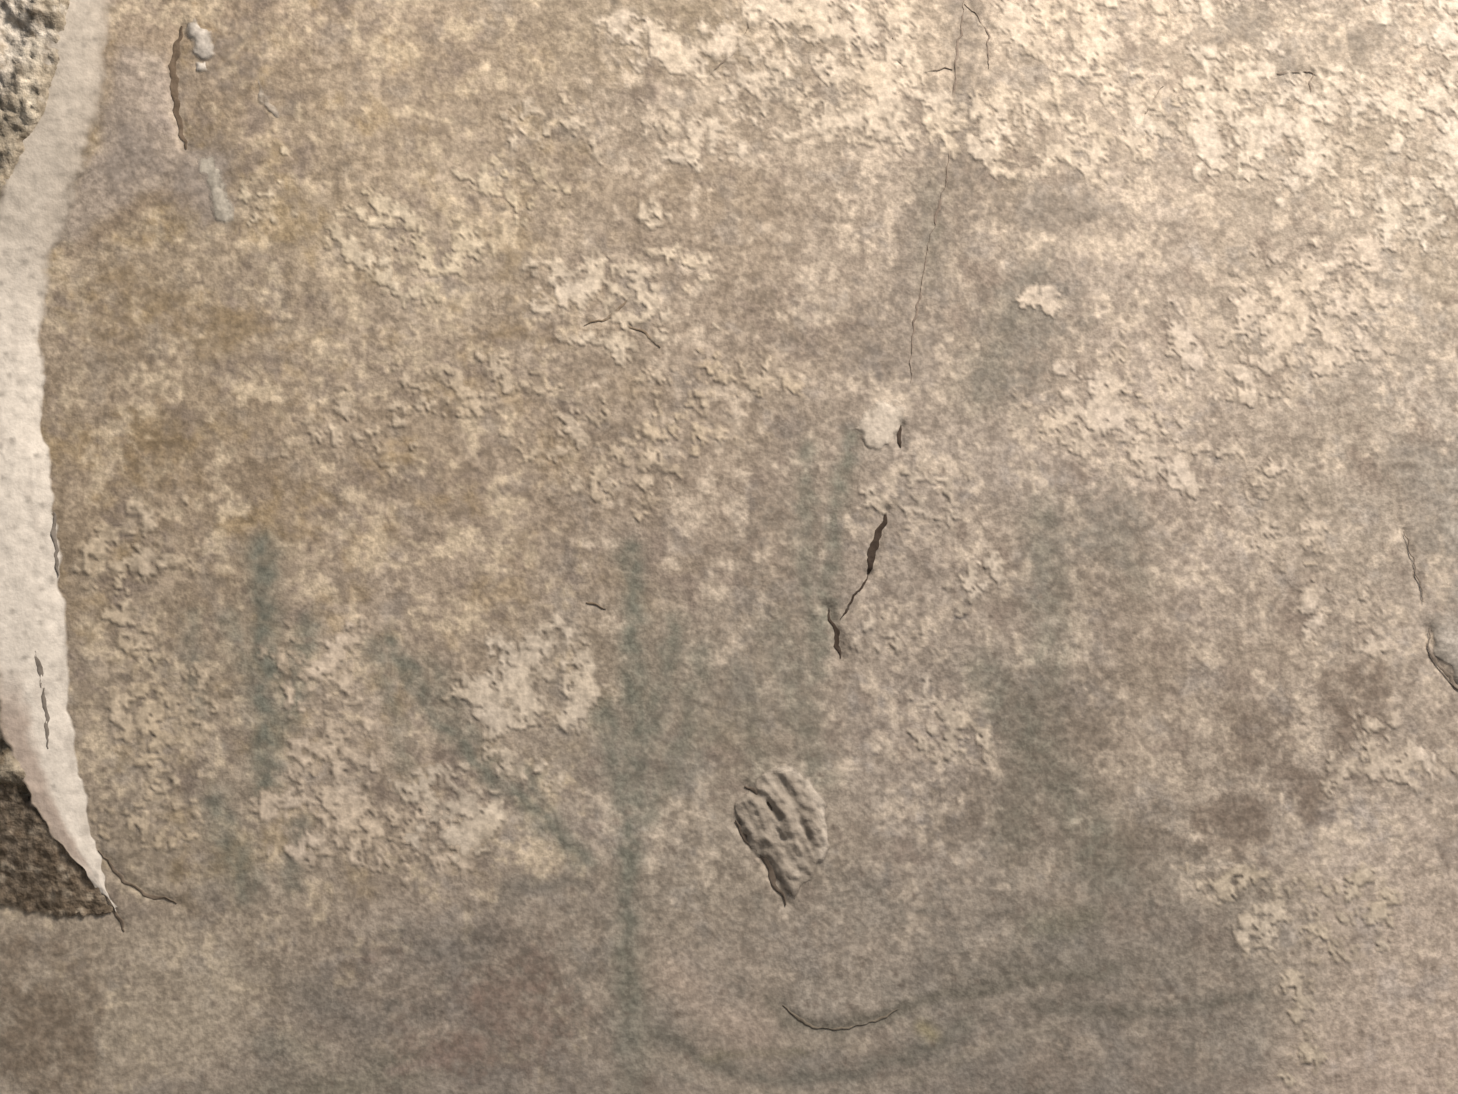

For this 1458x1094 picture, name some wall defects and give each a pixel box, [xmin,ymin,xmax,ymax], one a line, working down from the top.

spalling [0,0,70,199]
crack [895,425,903,447]
crack [828,513,887,659]
crack [1403,531,1458,689]
spalling [0,701,31,800]